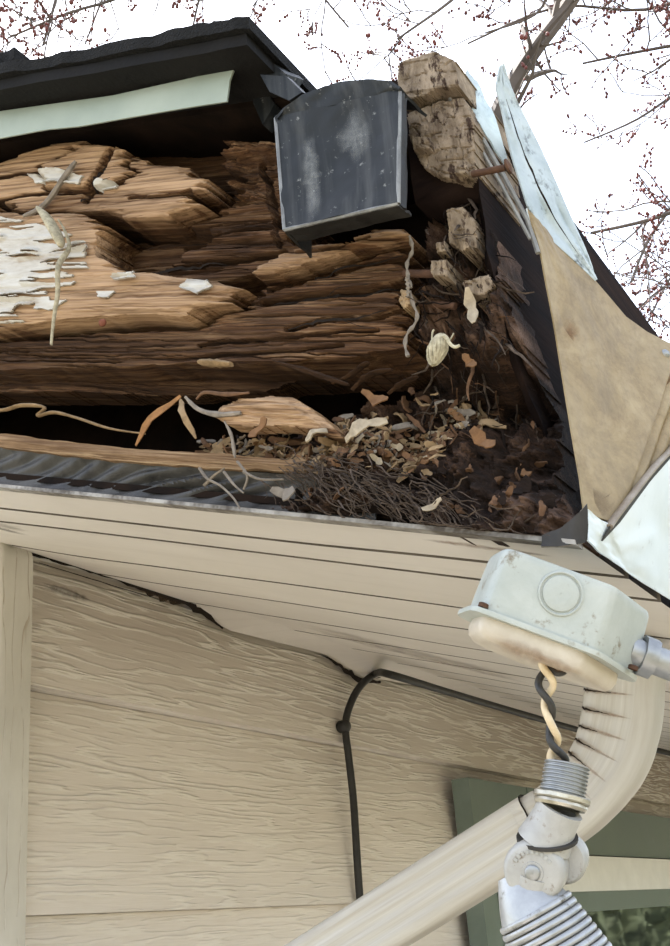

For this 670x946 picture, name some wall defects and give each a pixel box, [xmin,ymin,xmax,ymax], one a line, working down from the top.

peeling [27,167,118,193]
crack [80,156,110,202]
peeling [0,216,89,324]
peeling [96,271,136,298]
crack [154,262,230,274]
peeling [179,279,213,294]
crack [273,255,403,330]
crack [31,552,223,629]
crack [322,655,381,684]